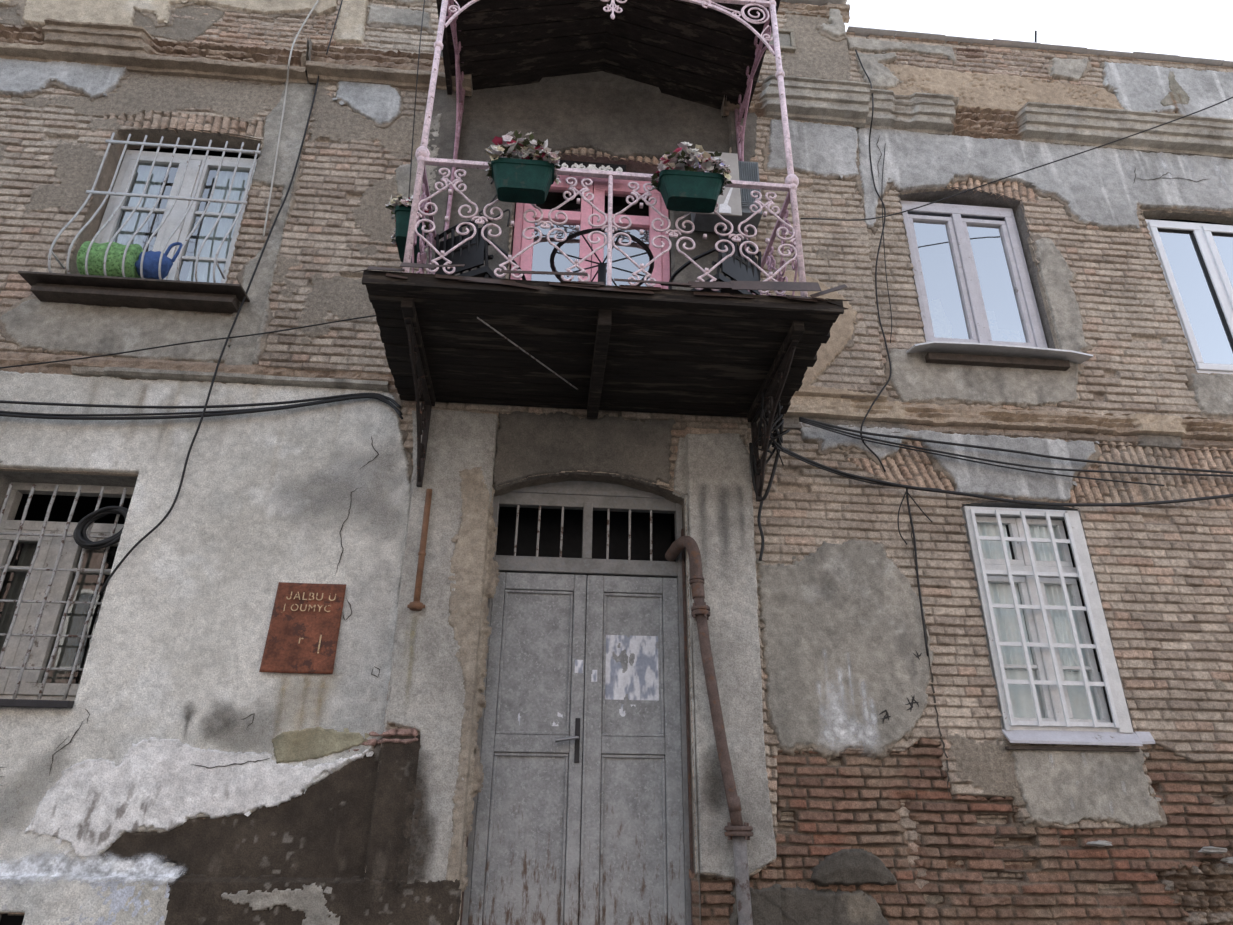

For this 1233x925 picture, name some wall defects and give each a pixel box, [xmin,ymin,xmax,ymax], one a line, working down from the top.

peeling [0,0,435,52]
peeling [815,2,1233,119]
peeling [0,80,316,365]
peeling [394,71,1233,290]
peeling [772,234,1093,409]
crack [335,436,379,620]
peeling [24,727,419,857]
peeling [221,883,340,925]
spalling [689,738,1233,925]